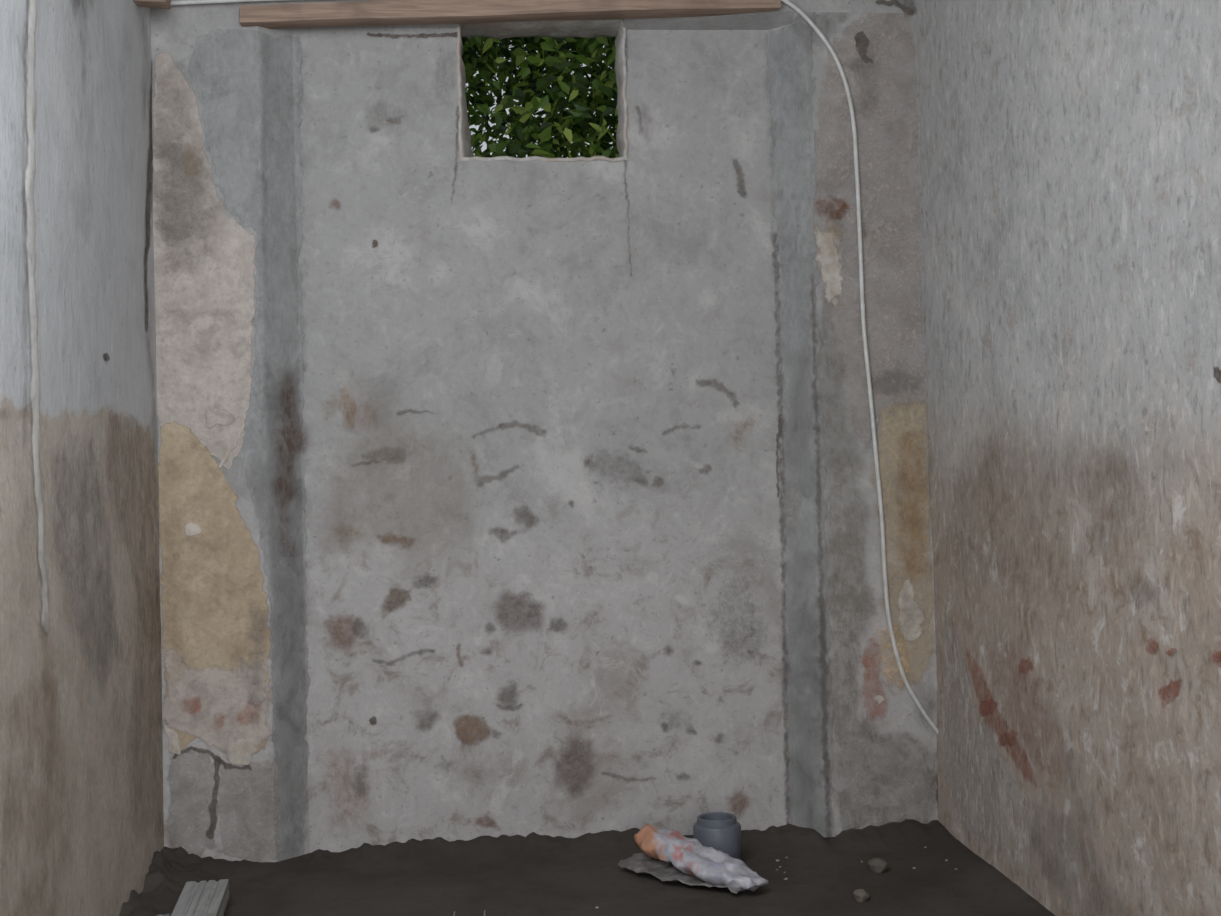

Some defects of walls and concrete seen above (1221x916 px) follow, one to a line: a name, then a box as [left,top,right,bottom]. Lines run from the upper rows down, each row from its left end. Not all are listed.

water stain [0,399,164,916]
spalling [152,52,273,765]